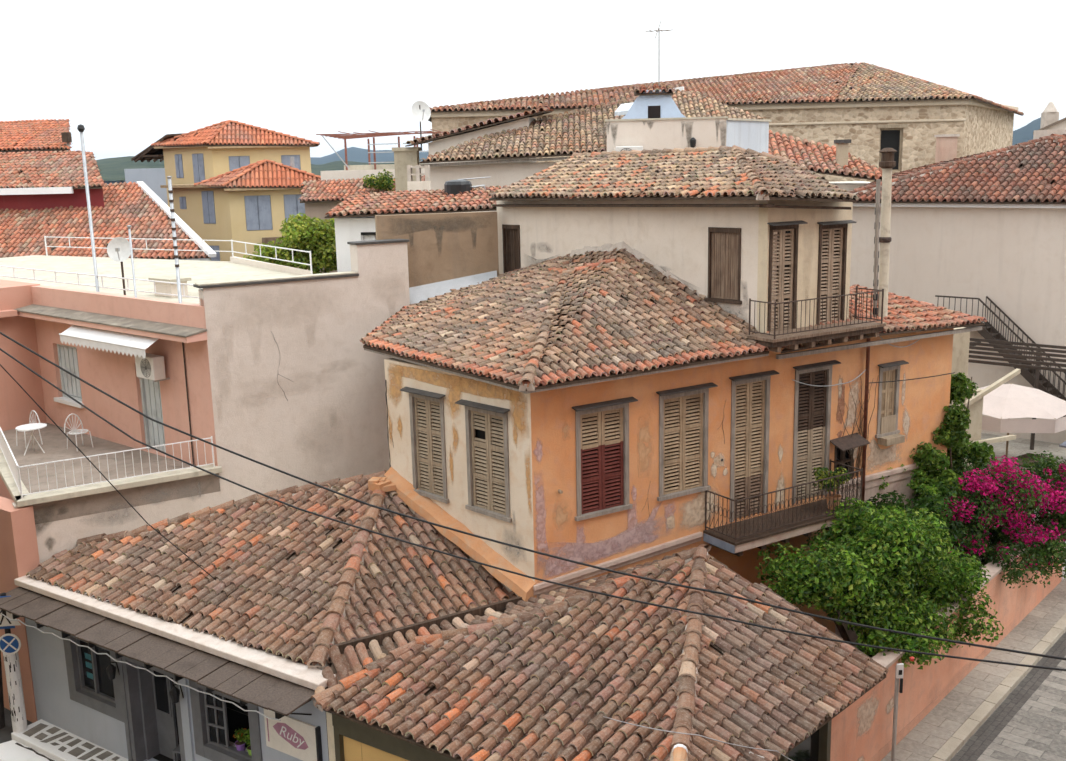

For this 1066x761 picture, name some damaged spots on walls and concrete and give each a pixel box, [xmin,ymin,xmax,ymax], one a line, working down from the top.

peeling [526,442,718,576]